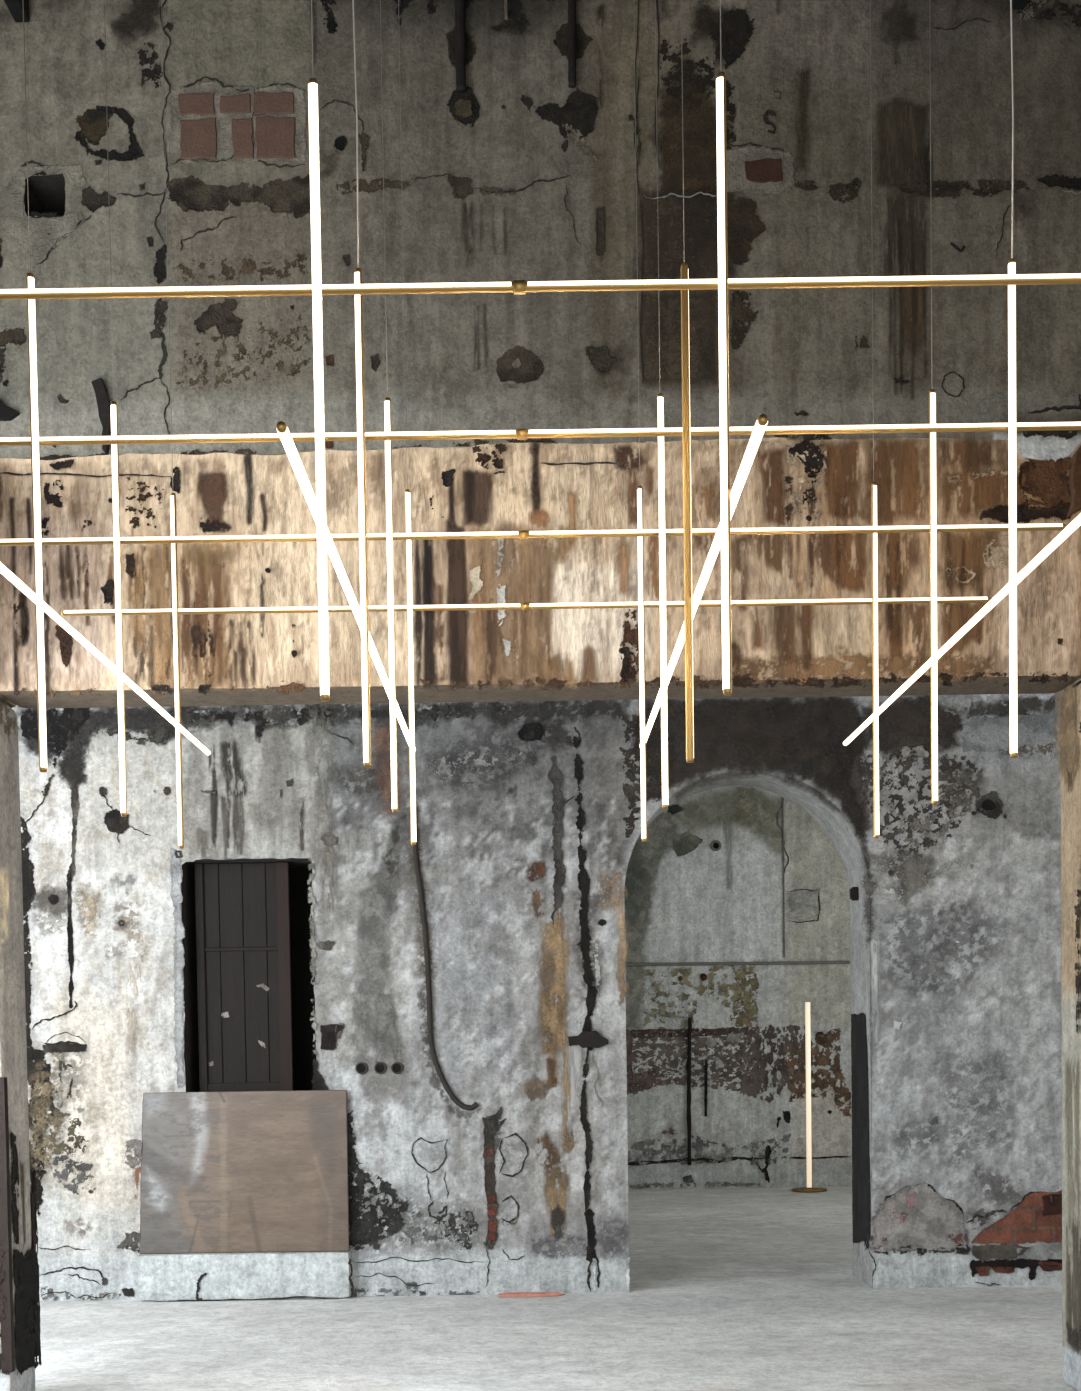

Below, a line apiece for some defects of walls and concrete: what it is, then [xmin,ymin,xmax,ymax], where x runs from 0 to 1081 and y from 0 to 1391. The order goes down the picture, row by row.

crack [121,0,171,435]
flaking render [0,77,369,283]
leakage [638,1,766,383]
leakage [10,498,73,696]
crack [0,459,180,536]
leakage [244,454,267,531]
leakage [415,443,595,687]
peeling [0,686,268,842]
rust [525,861,574,1237]
rust [598,873,627,1005]
peeling [253,609,1075,1028]
peeling [626,965,872,1251]